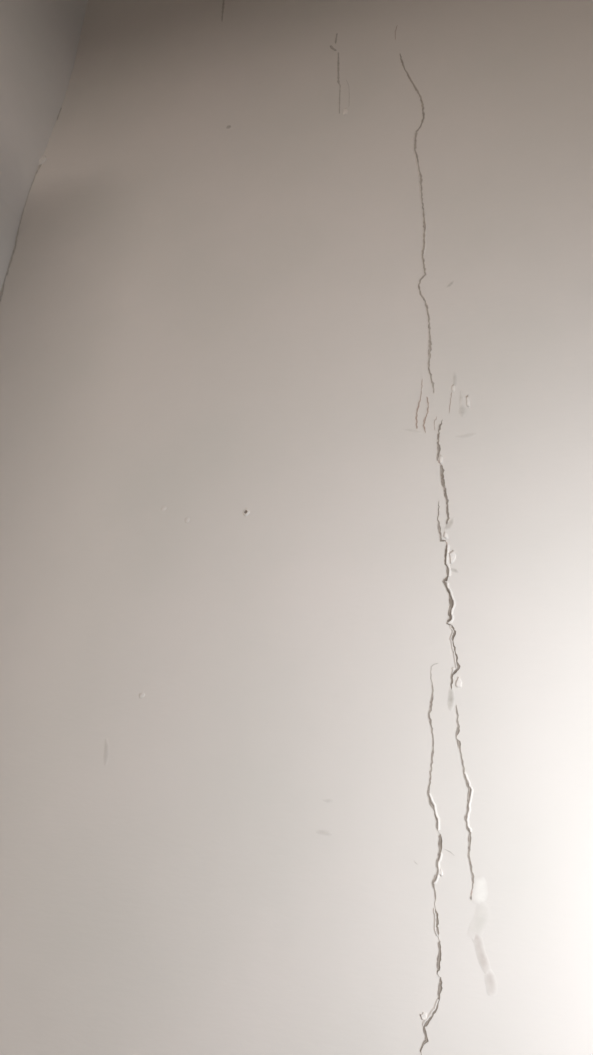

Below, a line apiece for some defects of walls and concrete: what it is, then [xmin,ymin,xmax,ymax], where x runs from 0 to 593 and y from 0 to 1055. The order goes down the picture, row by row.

crack [395,27,474,1055]